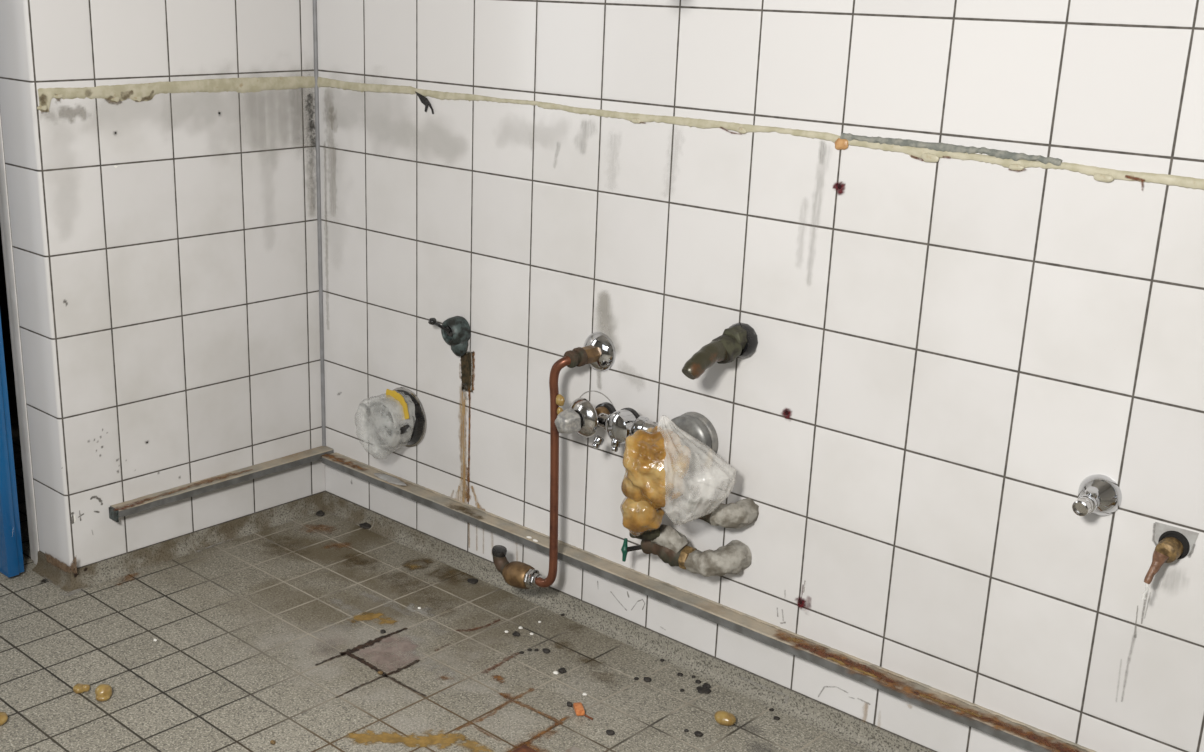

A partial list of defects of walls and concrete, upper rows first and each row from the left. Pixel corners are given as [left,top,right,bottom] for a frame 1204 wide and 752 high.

corrosion [322,454,366,470]
corrosion [450,351,485,519]
corrosion [776,633,1078,752]